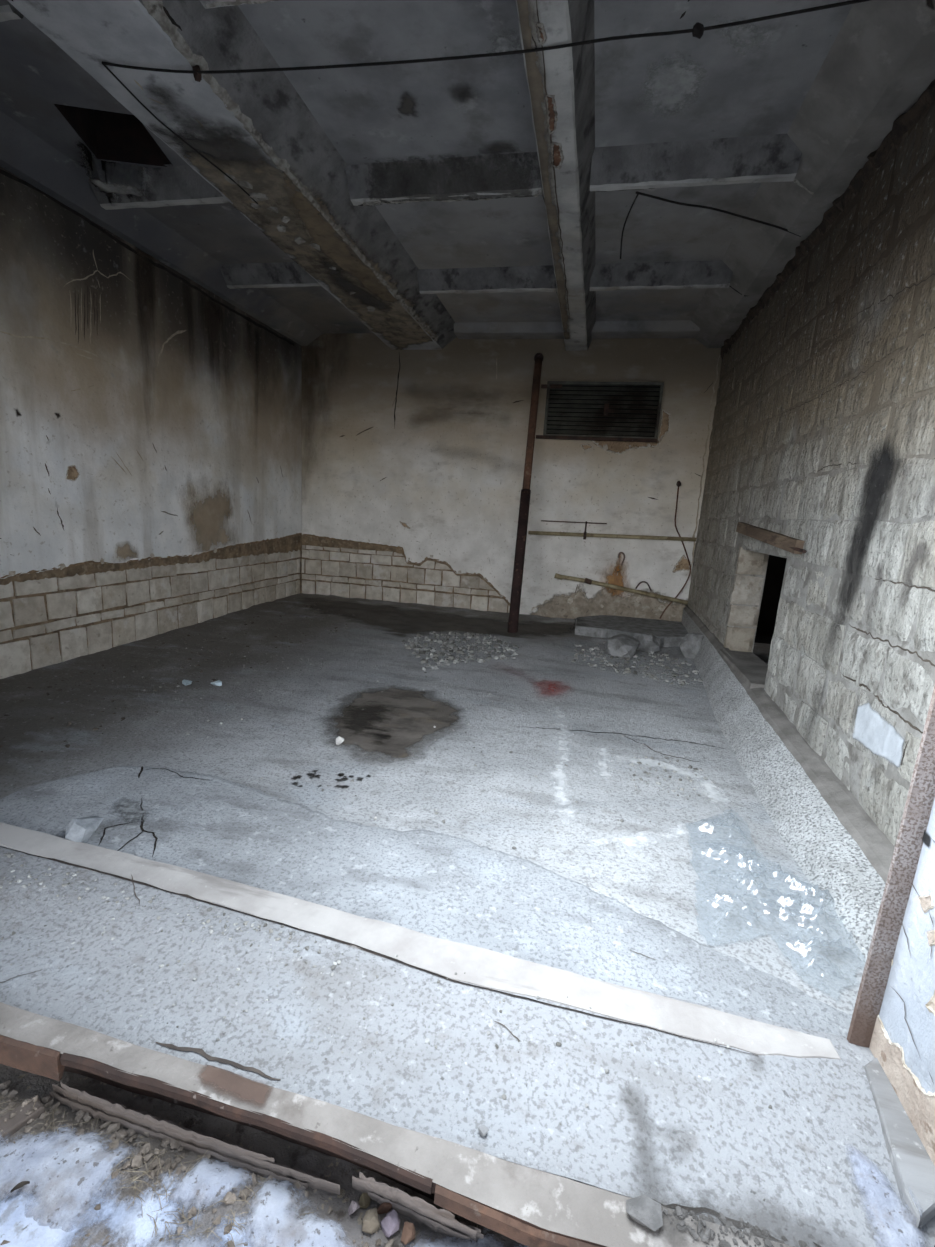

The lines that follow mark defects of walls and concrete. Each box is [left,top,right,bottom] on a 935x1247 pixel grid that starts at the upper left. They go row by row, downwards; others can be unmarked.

water stain [190,489,231,552]
spalling [0,533,510,679]
spalling [530,581,688,622]
water stain [334,688,459,758]
crack [98,766,207,904]
spalling [918,895,934,913]
spalling [925,990,935,1016]
crack [156,1042,281,1080]
spalling [869,1015,935,1166]
crack [652,1199,778,1247]